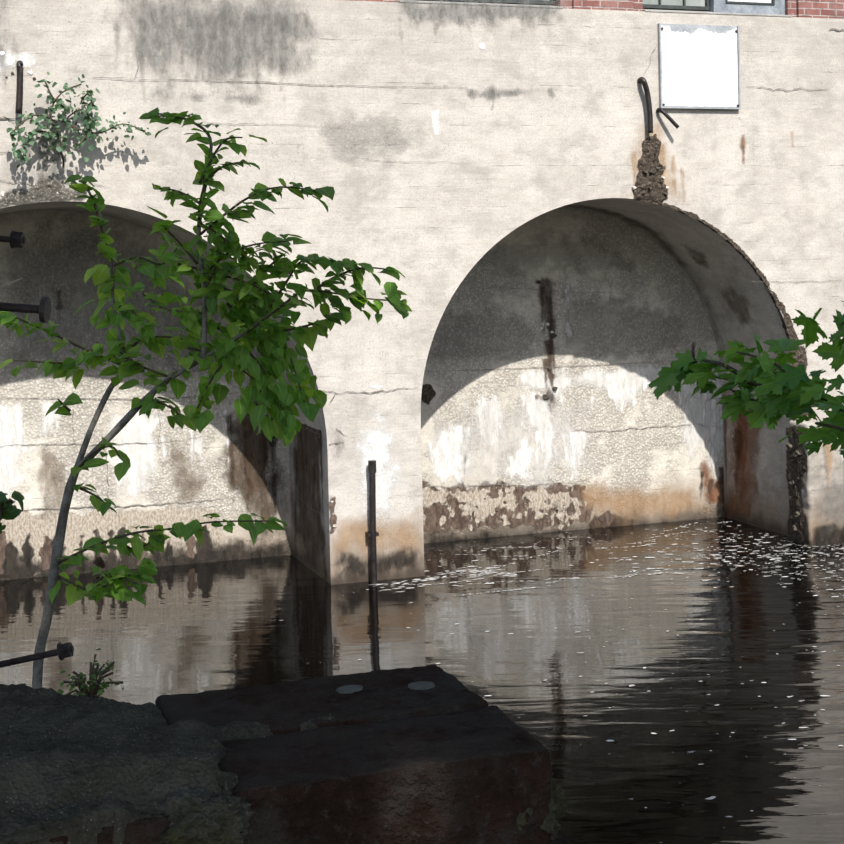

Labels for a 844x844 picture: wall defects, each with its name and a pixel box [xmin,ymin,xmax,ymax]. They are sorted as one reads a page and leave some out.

leakage [137,0,311,77]
corrosion [536,278,558,411]
leakage [40,453,62,508]
leakage [59,410,326,574]
spalling [421,384,436,405]
efflorescence [429,396,503,482]
peeling [422,481,633,535]
efflorescence [506,365,663,481]
corrosion [700,410,759,516]